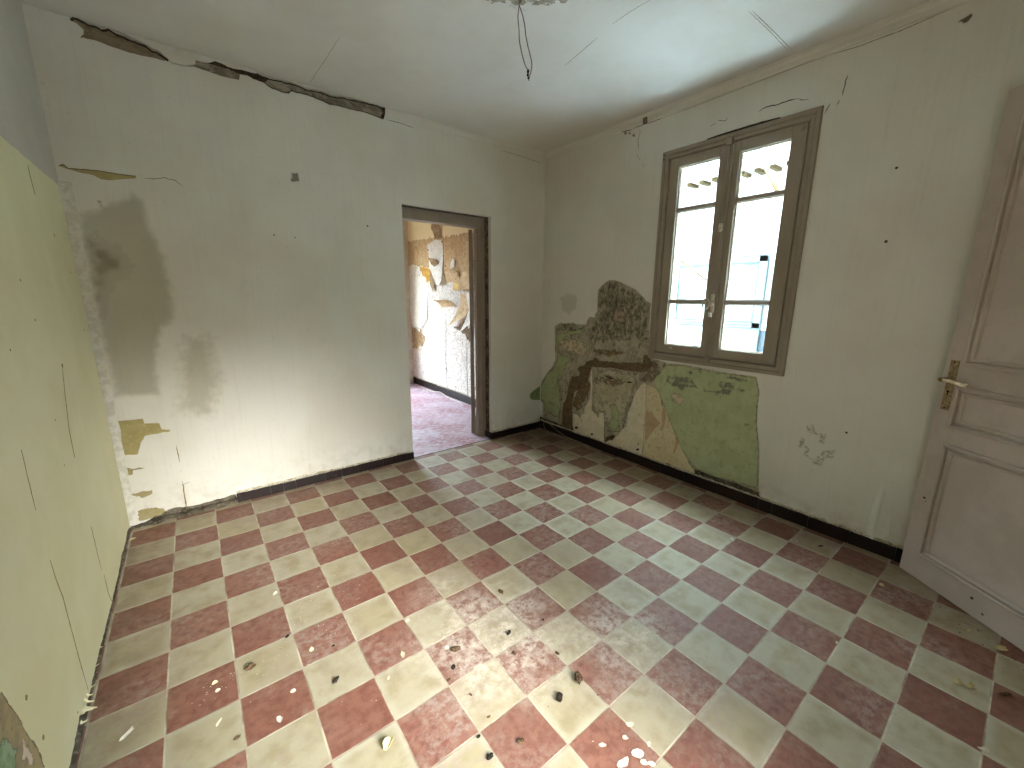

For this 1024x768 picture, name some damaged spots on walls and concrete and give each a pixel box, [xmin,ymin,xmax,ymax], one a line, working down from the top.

spalling [67,16,385,119]
crack [622,9,949,166]
peeling [59,164,182,186]
flaking render [530,280,761,497]
peeling [118,419,170,475]
peeling [132,490,165,521]
peeling [0,692,45,768]